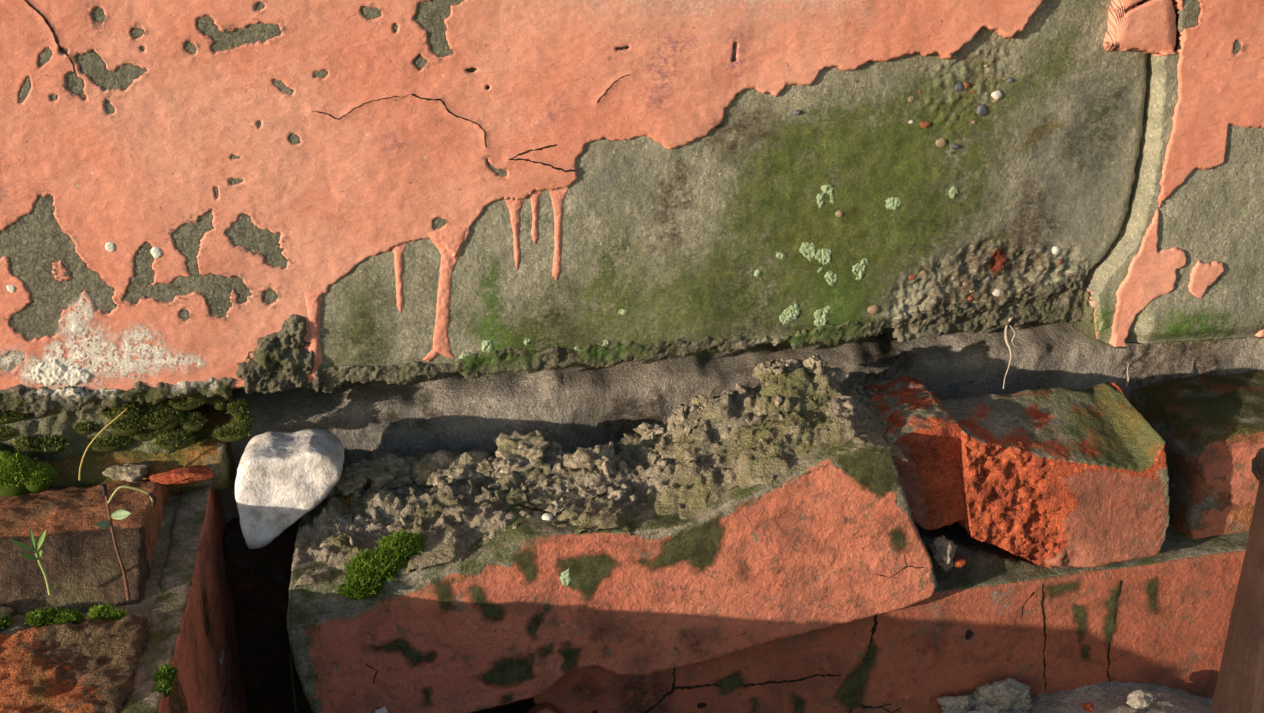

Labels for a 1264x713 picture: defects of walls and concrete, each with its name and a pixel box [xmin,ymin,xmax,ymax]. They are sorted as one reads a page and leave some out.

crack [24,0,75,73]
crack [1119,0,1184,51]
crack [312,94,576,172]
peeling [0,0,1264,417]
water stain [0,296,212,397]
crack [643,615,902,713]